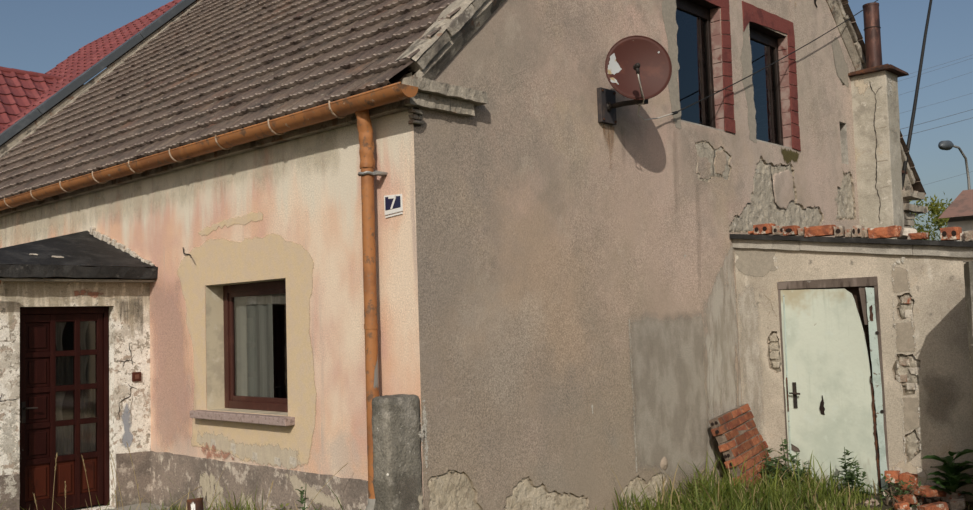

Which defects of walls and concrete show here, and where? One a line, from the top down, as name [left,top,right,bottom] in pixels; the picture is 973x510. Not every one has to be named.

spalling [695,140,732,183]
crack [870,84,898,220]
spalling [729,156,824,234]
spalling [835,167,856,221]
spalling [896,293,915,320]
spalling [767,331,781,373]
spalling [892,354,921,396]
peeling [0,405,21,499]
spalling [418,400,483,510]
spalling [893,429,927,490]
spalling [504,476,590,510]
spalling [620,472,667,510]